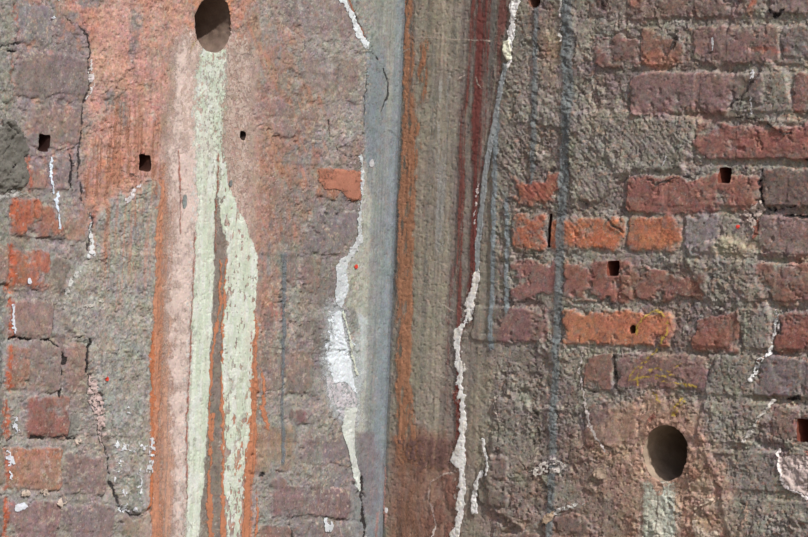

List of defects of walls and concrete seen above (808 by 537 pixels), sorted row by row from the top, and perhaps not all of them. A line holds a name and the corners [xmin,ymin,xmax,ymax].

crack [339,0,389,125]
crack [8,18,103,416]
rust [186,236,196,512]
leakage [165,23,258,537]
rust [206,230,228,537]
rust [241,311,270,537]
peeling [318,154,374,491]
crack [358,473,366,537]
rust [394,0,428,474]
crack [428,0,521,537]
leakage [642,481,679,537]
spalling [776,448,808,500]